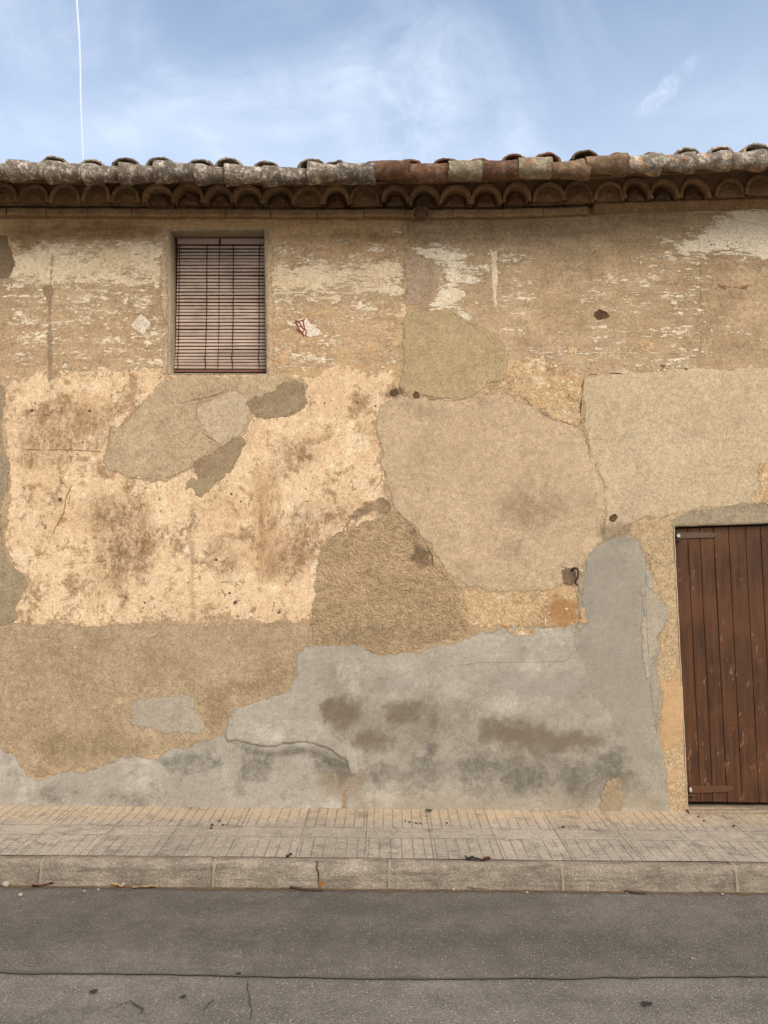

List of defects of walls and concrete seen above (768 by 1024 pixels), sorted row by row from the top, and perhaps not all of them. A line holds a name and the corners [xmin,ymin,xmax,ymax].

peeling [412,242,490,321]
peeling [616,209,768,309]
peeling [597,321,713,374]
peeling [477,352,608,426]
peeling [2,231,409,627]
crack [522,373,621,526]
peeling [462,569,588,637]